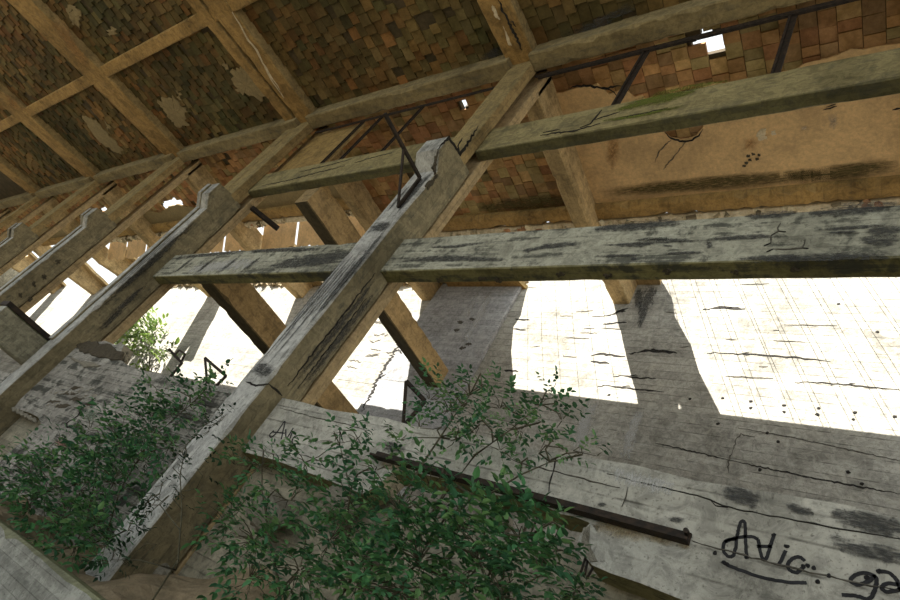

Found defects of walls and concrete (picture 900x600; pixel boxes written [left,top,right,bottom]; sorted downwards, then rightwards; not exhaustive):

peeling [66,5,82,28]
peeling [232,12,284,98]
peeling [222,62,265,102]
peeling [157,90,190,128]
crack [540,84,668,136]
peeling [82,116,124,155]
crack [437,126,478,156]
damp [619,162,891,194]
crack [247,273,402,432]
crack [656,428,898,494]
crack [508,458,900,539]
crack [693,541,899,591]